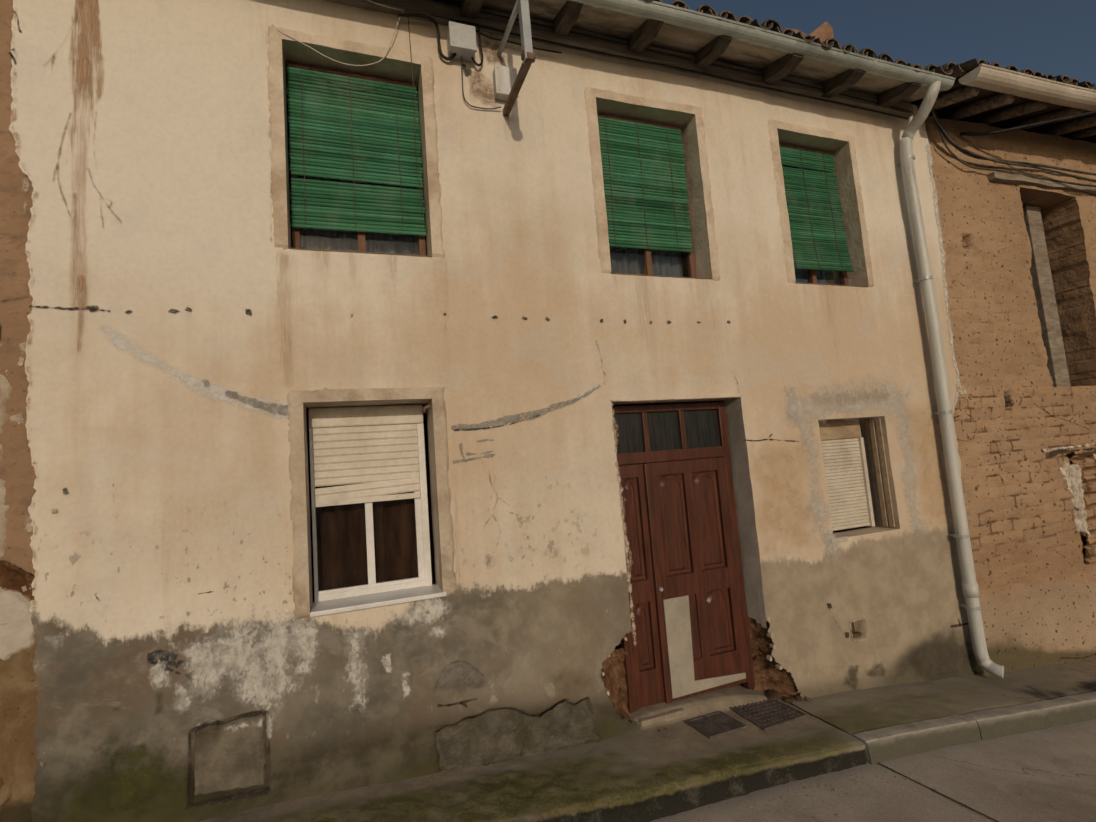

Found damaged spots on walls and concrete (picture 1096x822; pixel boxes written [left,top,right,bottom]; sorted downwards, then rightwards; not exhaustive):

peeling [0,338,31,461]
crack [29,305,288,417]
flaking render [1043,443,1096,564]
peeling [0,479,36,661]
spalling [601,404,641,727]
peeling [150,615,318,738]
peeling [345,628,370,706]
peeling [381,654,410,697]
spalling [748,617,802,704]
leakage [846,666,883,688]